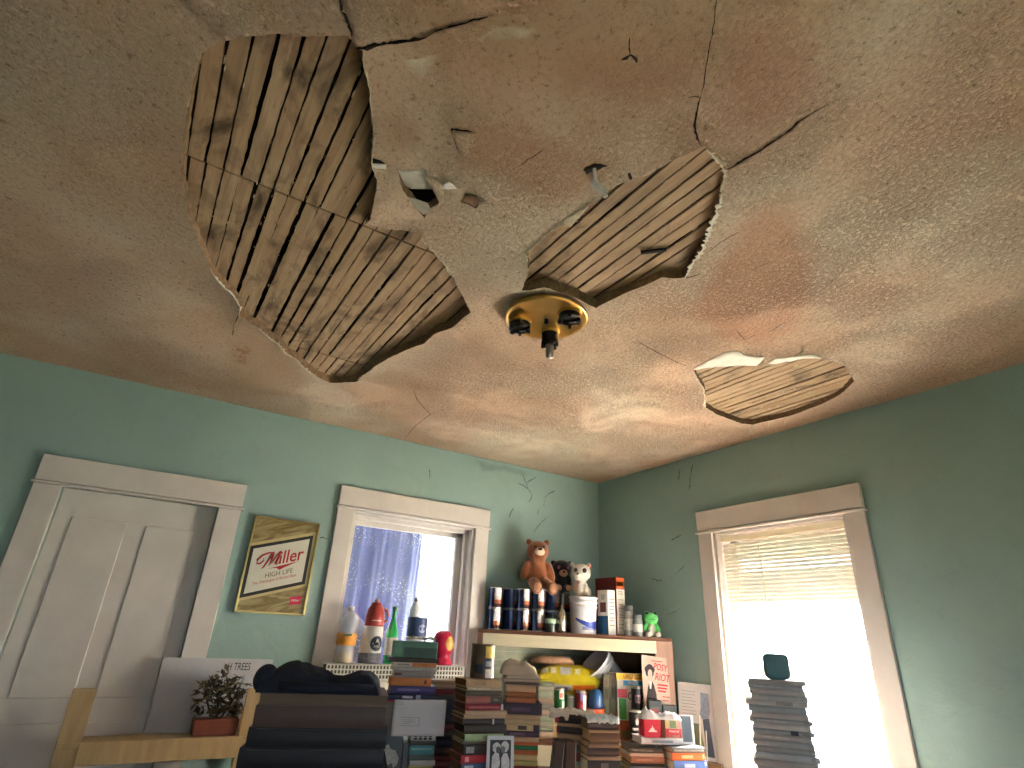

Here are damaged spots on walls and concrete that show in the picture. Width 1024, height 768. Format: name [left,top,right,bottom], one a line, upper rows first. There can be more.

crack [339,0,353,37]
spalling [180,0,547,381]
spalling [525,146,728,299]
crack [688,0,717,147]
crack [726,104,835,178]
spalling [693,346,851,434]